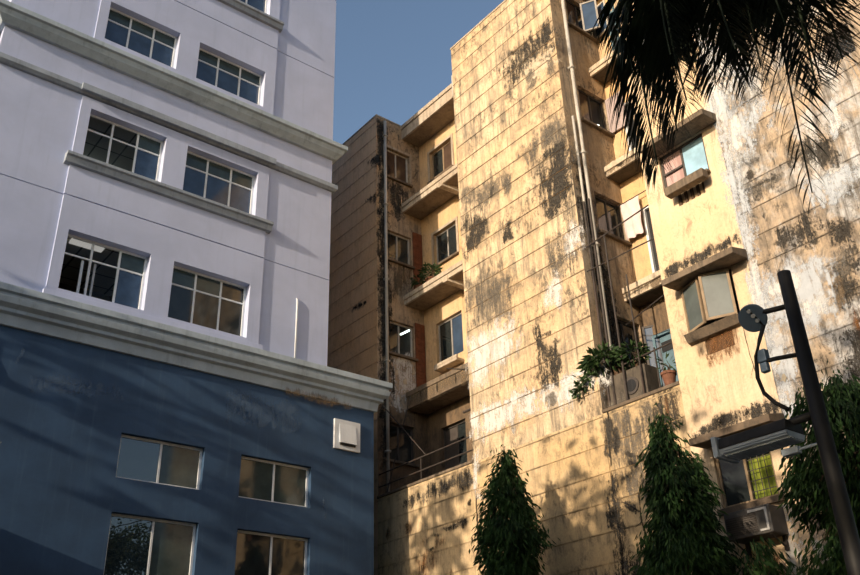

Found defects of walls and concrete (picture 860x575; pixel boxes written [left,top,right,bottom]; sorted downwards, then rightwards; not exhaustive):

damp [498,18,563,99]
damp [460,179,510,260]
damp [531,126,624,359]
damp [664,32,788,348]
damp [774,96,860,328]
damp [476,278,511,311]
damp [403,319,609,511]
damp [613,388,683,460]
damp [692,401,779,437]